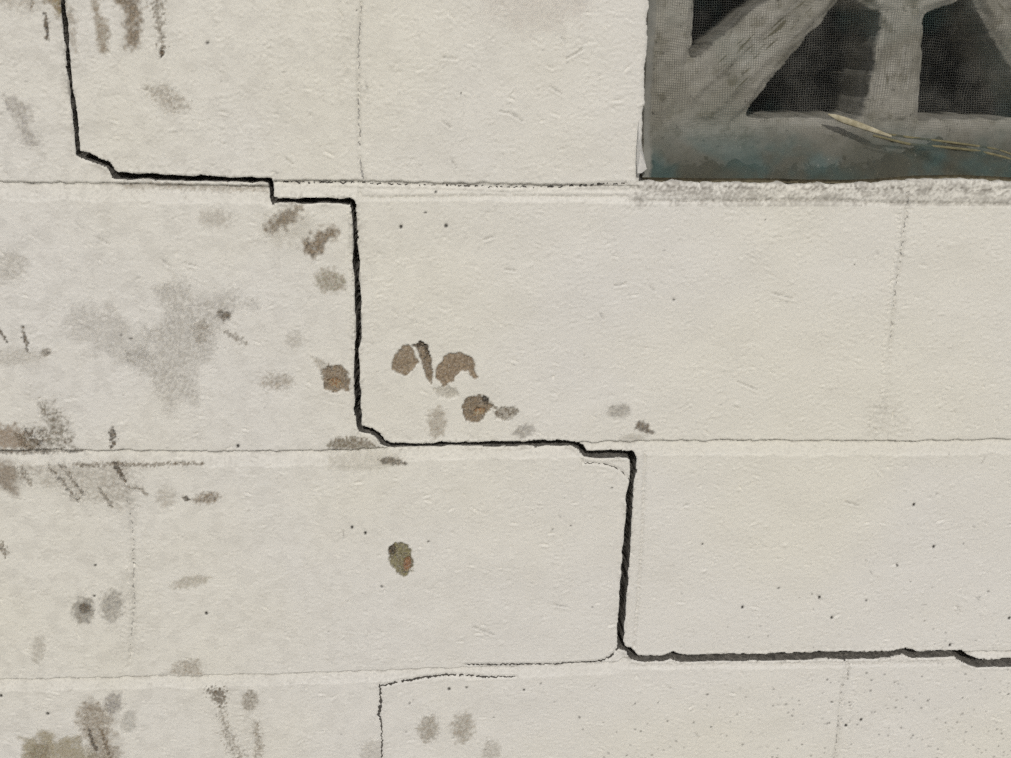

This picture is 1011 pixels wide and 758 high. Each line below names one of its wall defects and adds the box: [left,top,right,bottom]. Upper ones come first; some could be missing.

crack [355,6,363,146]
crack [283,158,408,185]
crack [419,181,625,189]
peeling [392,341,478,386]
peeling [322,364,350,392]
peeling [462,394,519,422]
peeling [389,542,413,576]
crack [467,652,614,666]